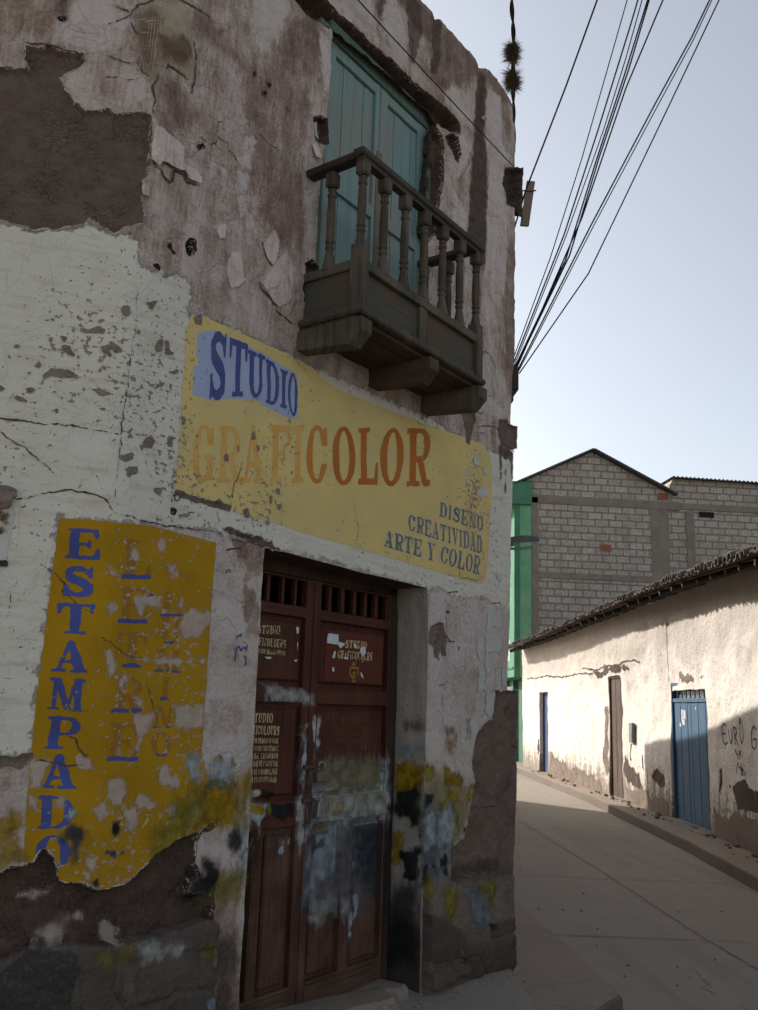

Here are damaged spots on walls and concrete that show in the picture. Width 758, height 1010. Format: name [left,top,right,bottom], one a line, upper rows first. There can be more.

damp [407,0,442,74]
spalling [0,43,202,234]
damp [469,74,488,263]
peeling [261,231,320,307]
crack [0,294,264,547]
spalling [497,418,518,449]
crack [527,659,640,680]
peeling [0,752,51,811]
peeling [92,778,177,831]
damp [422,794,448,883]
spalling [450,689,519,879]
spalling [0,821,219,959]